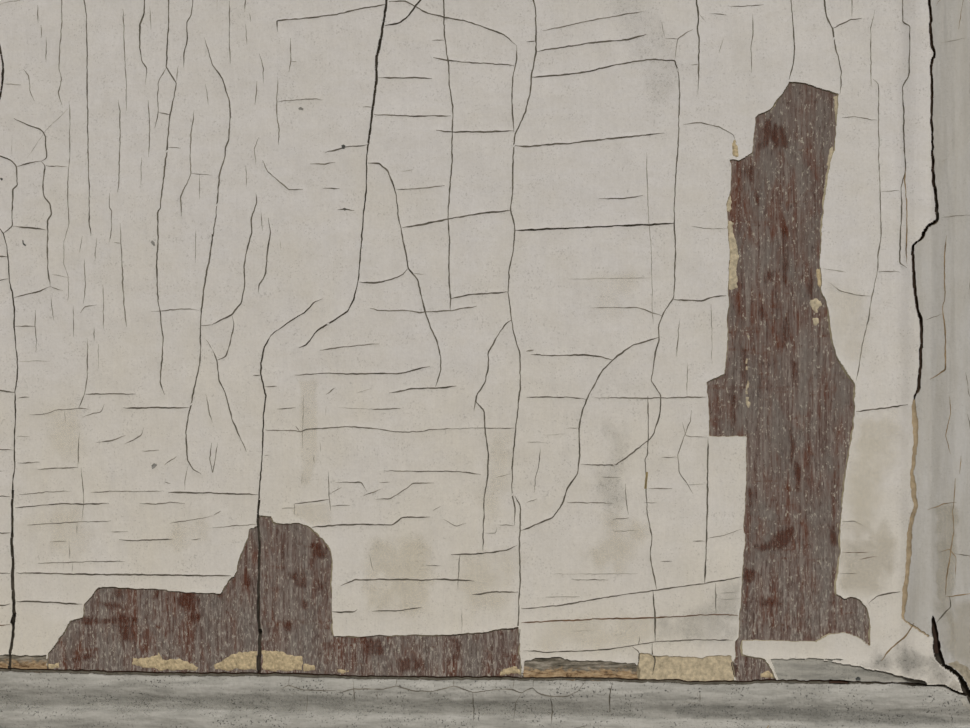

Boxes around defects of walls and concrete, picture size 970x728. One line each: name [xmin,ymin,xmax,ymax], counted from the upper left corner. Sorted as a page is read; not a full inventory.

crack [0,46,34,100]
crack [255,54,320,144]
crack [788,1,796,79]
crack [246,142,302,190]
crack [34,0,129,422]
crack [123,0,271,483]
crack [268,0,741,664]
peeling [0,82,929,685]
crack [25,439,108,525]
crack [19,562,230,576]
crack [116,531,170,541]
crack [881,623,914,661]